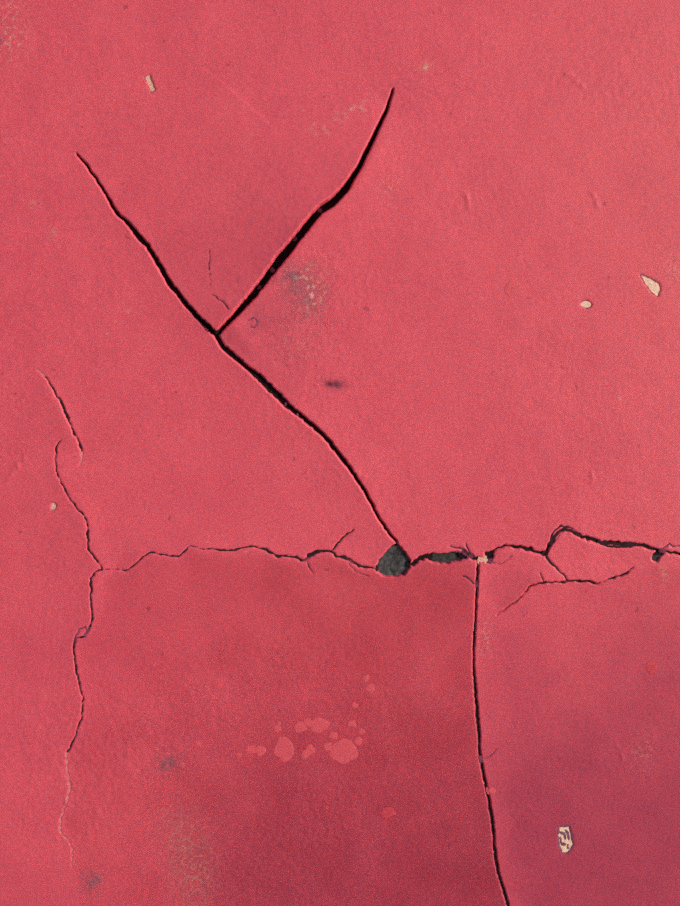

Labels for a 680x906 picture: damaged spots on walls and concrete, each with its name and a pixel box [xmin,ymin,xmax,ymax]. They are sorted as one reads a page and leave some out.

peeling [639,274,661,297]
crack [77,99,680,906]
peeling [557,825,574,854]